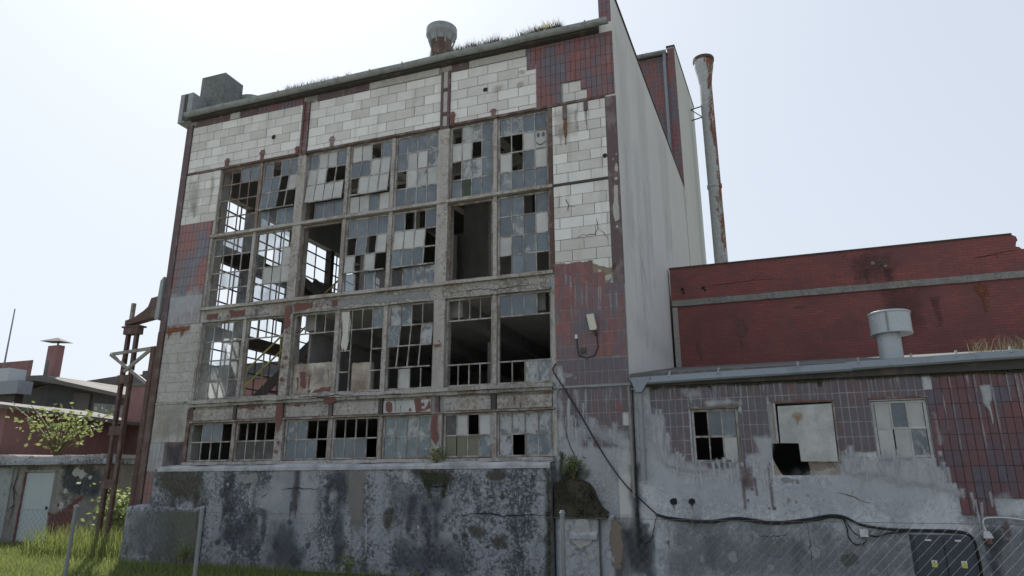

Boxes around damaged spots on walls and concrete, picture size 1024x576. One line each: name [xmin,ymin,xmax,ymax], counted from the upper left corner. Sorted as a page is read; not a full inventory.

leakage [215,471,310,568]
leakage [326,471,365,571]
leakage [383,480,525,576]
leakage [487,469,506,480]
spalling [810,462,836,471]